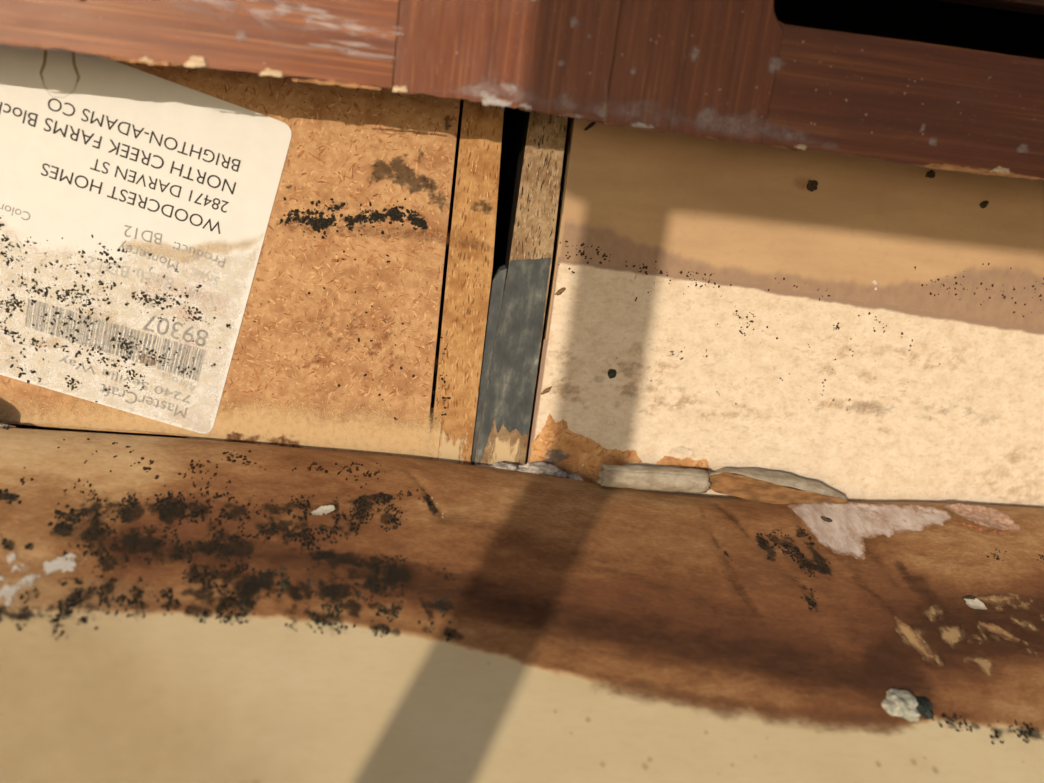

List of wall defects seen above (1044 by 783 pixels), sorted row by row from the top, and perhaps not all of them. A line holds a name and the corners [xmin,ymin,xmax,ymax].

water stain [277,159,442,239]
water stain [0,212,1044,744]
peeling [530,414,642,484]
peeling [656,447,1020,560]